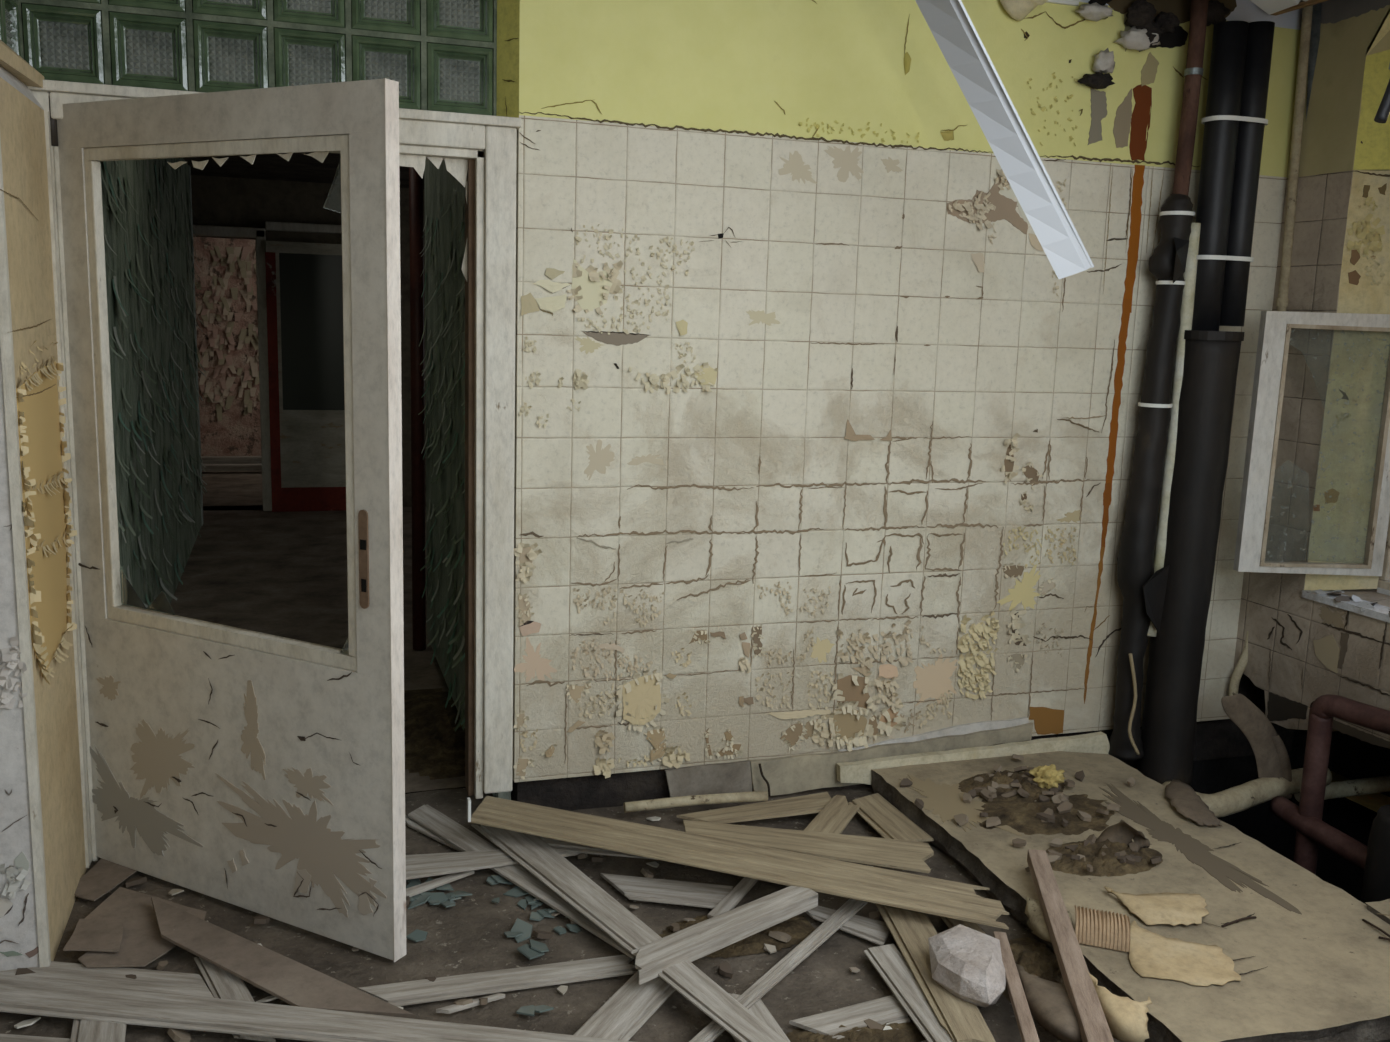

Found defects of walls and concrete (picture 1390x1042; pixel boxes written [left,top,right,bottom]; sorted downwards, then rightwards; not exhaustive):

spalling [1088,0,1191,148]
spalling [947,175,1044,251]
crack [585,331,647,369]
crack [812,296,930,387]
corrosion [1084,85,1152,704]
peeling [16,356,77,685]
spalling [689,624,765,658]
crack [527,626,753,760]
peeling [616,669,677,765]
spalling [703,728,744,759]
spalling [769,664,906,751]
corrosion [1029,707,1064,735]